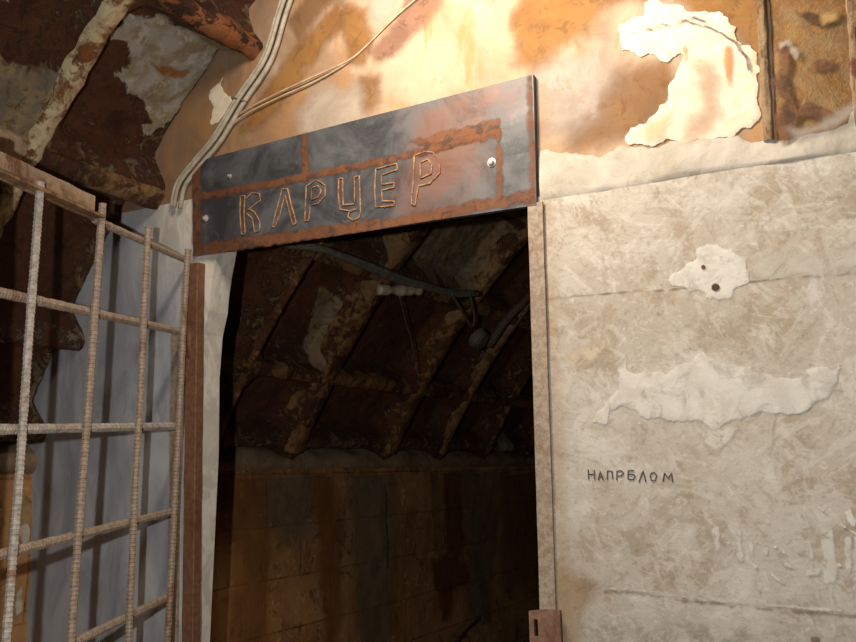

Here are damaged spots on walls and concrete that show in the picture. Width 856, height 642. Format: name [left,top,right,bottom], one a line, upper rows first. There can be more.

crack [634,16,750,71]
corrosion [798,11,839,27]
corrosion [155,66,189,78]
flaking render [618,0,761,147]
corrosion [771,41,834,144]
peeling [668,244,856,300]
peeling [592,350,840,451]